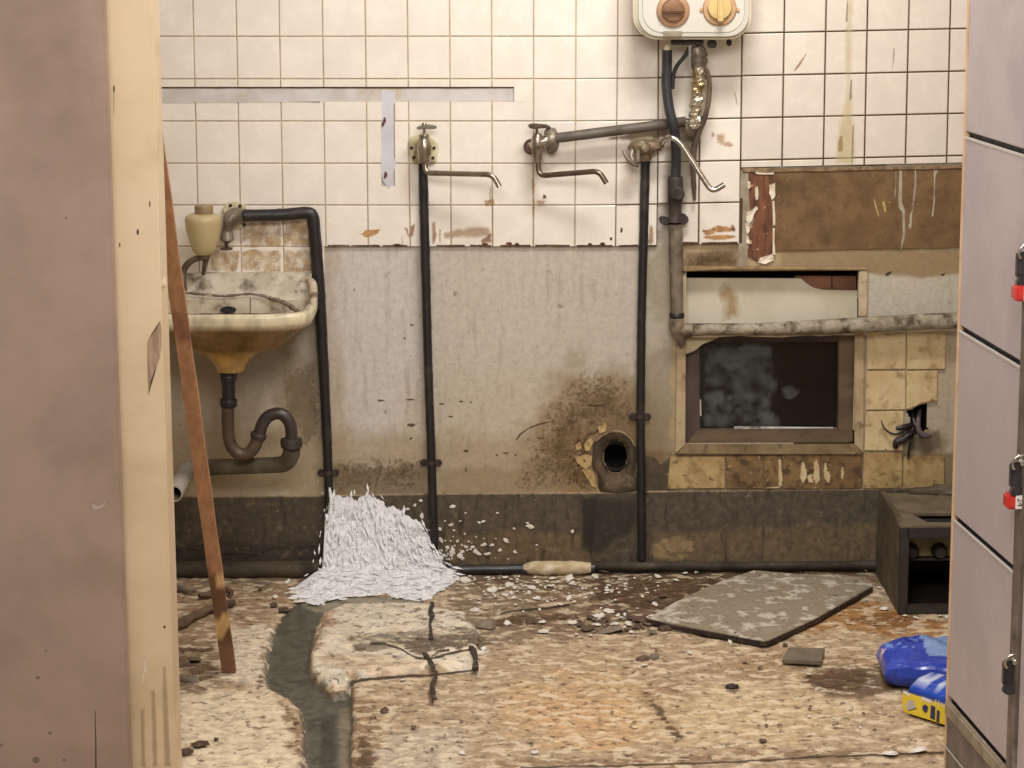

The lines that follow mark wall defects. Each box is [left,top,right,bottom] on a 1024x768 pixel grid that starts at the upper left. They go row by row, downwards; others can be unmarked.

damp [211,221,312,272]
corrosion [703,225,735,240]
peeling [683,171,775,264]
flaking render [793,274,856,290]
damp [523,377,629,487]
spalling [575,422,637,493]
damp [636,456,670,491]